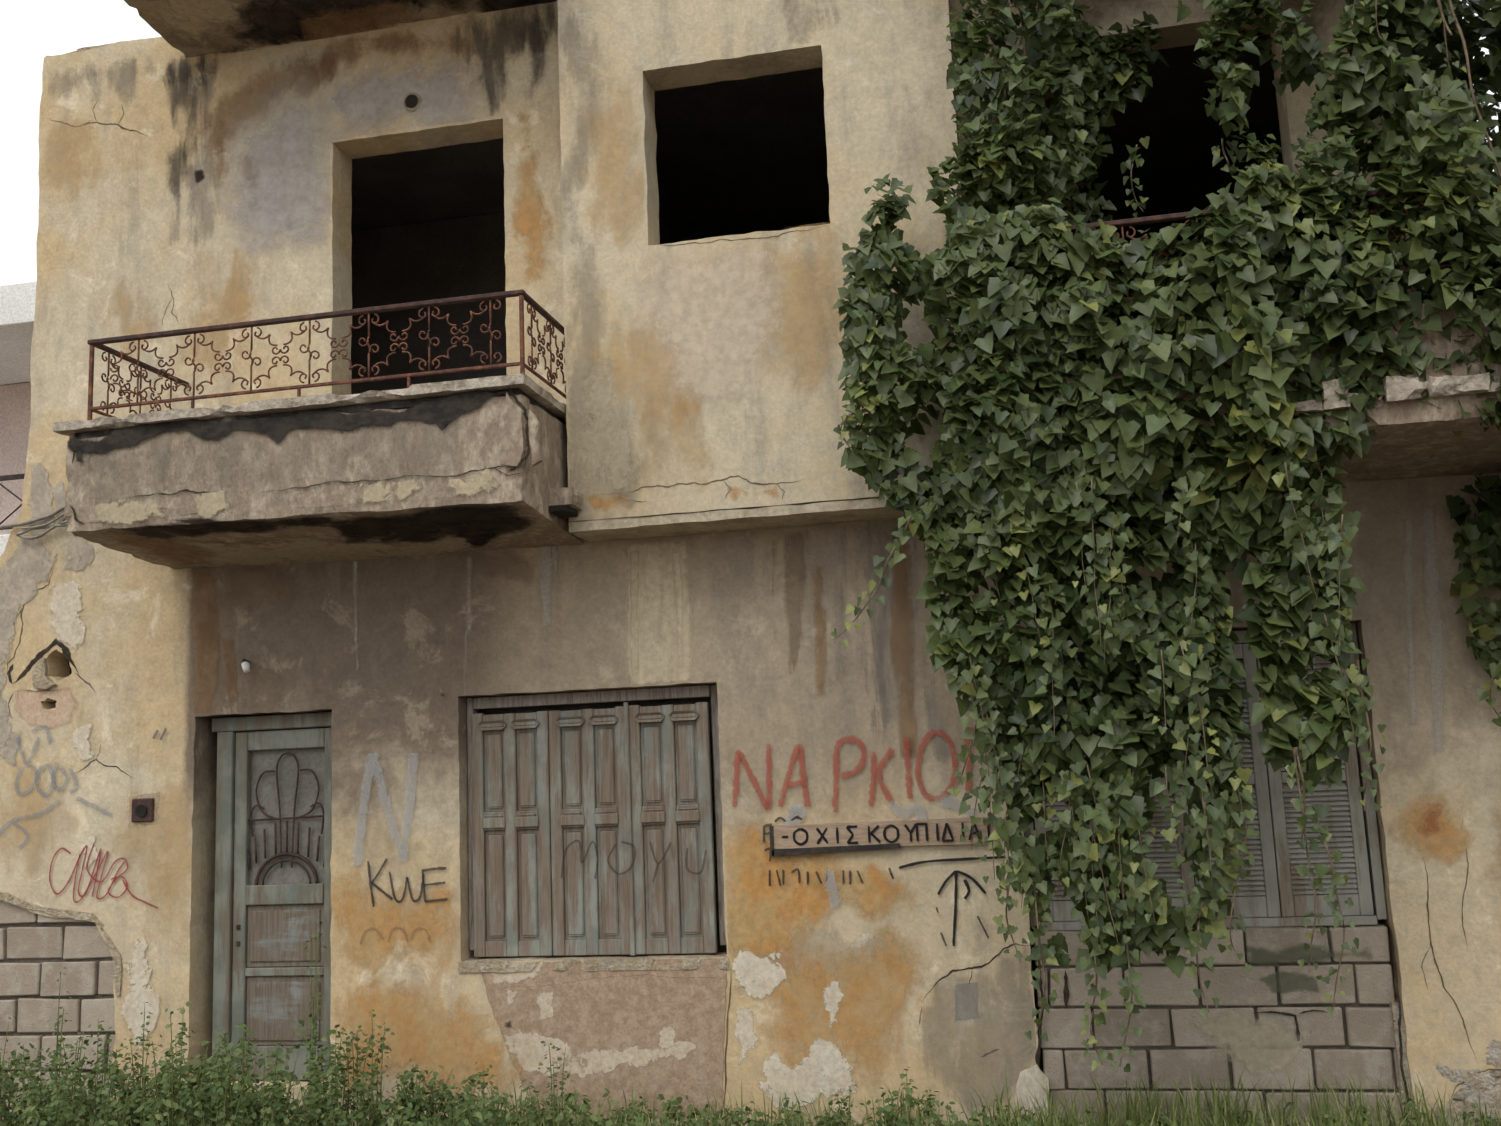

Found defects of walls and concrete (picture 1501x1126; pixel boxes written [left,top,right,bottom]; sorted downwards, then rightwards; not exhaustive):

damp [232,0,557,111]
crack [49,102,147,136]
damp [167,57,215,191]
damp [514,158,545,274]
peeling [94,499,164,524]
spalling [449,392,525,496]
crack [590,475,798,502]
peeling [0,463,94,766]
spalling [0,892,159,1126]
peeling [491,961,696,1078]
peeling [732,949,857,1111]
crack [1393,817,1501,1126]